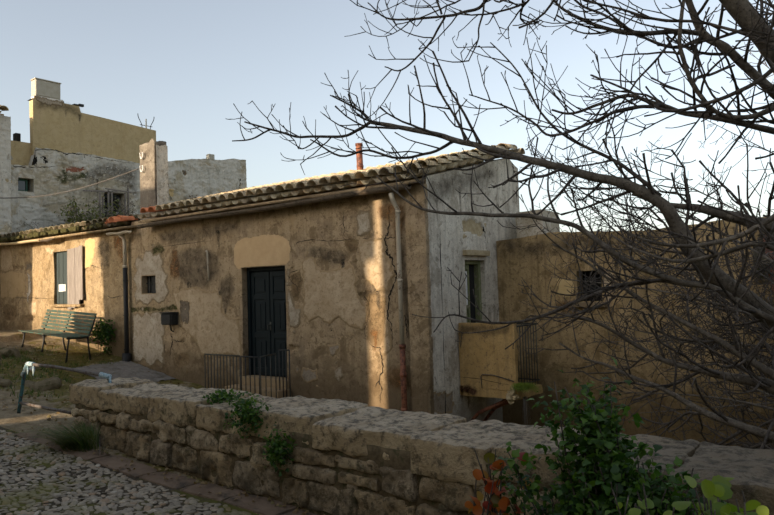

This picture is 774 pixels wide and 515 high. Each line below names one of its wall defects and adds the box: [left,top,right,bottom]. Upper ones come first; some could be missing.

peeling [286,210,396,357]
crack [296,210,407,403]